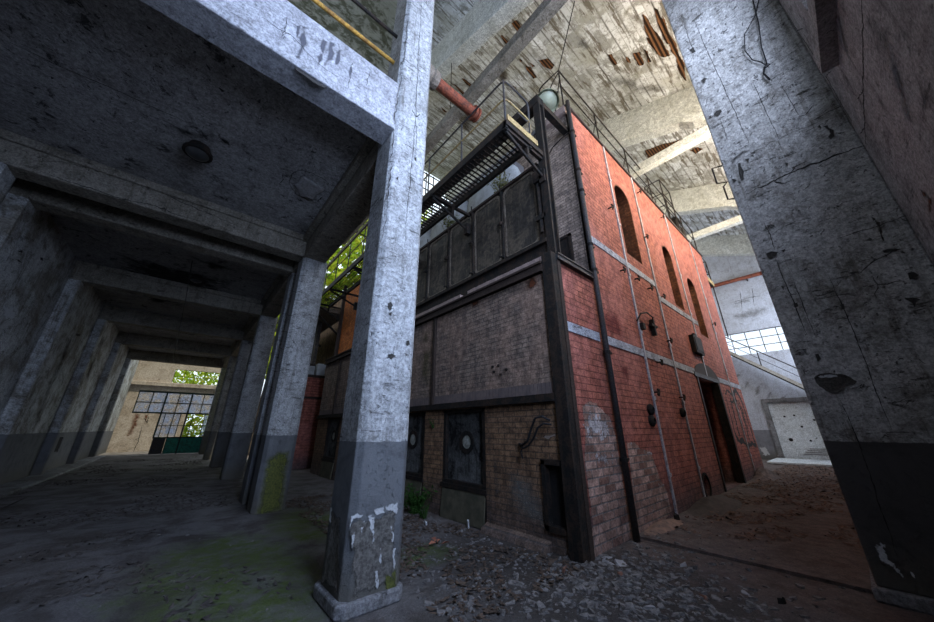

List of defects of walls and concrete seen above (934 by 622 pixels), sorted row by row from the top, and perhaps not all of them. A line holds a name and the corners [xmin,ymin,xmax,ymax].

spalling [608,8,687,81]
spalling [519,59,554,79]
crack [747,0,866,194]
spalling [645,139,681,158]
spalling [815,373,857,393]
peeling [322,503,398,597]
peeling [875,542,915,578]